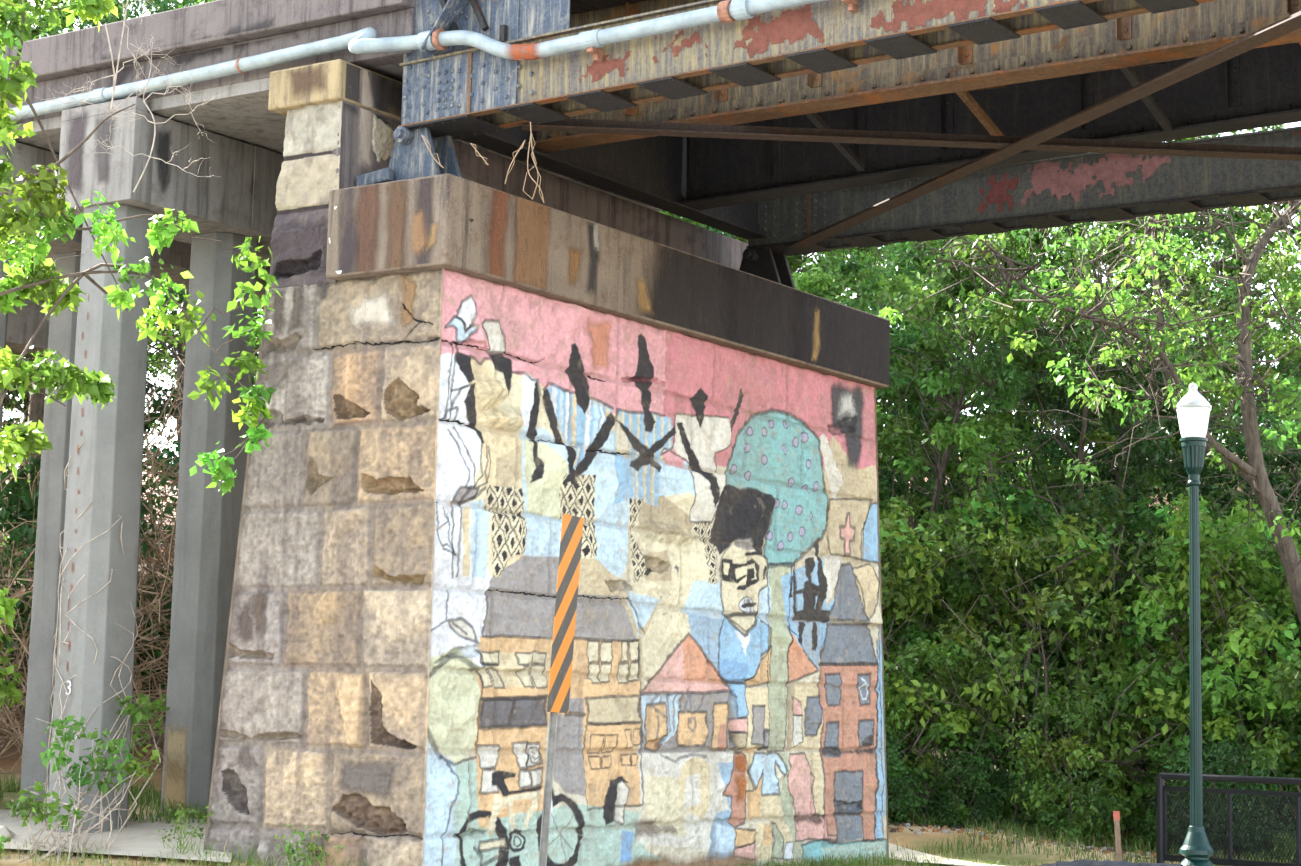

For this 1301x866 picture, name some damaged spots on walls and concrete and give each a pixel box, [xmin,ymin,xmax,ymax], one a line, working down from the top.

corrosion [509,42,541,61]
peeling [733,4,824,58]
peeling [870,0,1027,33]
peeling [977,153,1171,214]
corrosion [412,213,436,252]
corrosion [490,189,549,289]
spalling [275,250,322,280]
spalling [257,378,430,428]
spalling [361,474,424,495]
spalling [369,679,417,749]
spalling [221,768,250,815]
spalling [332,793,408,835]